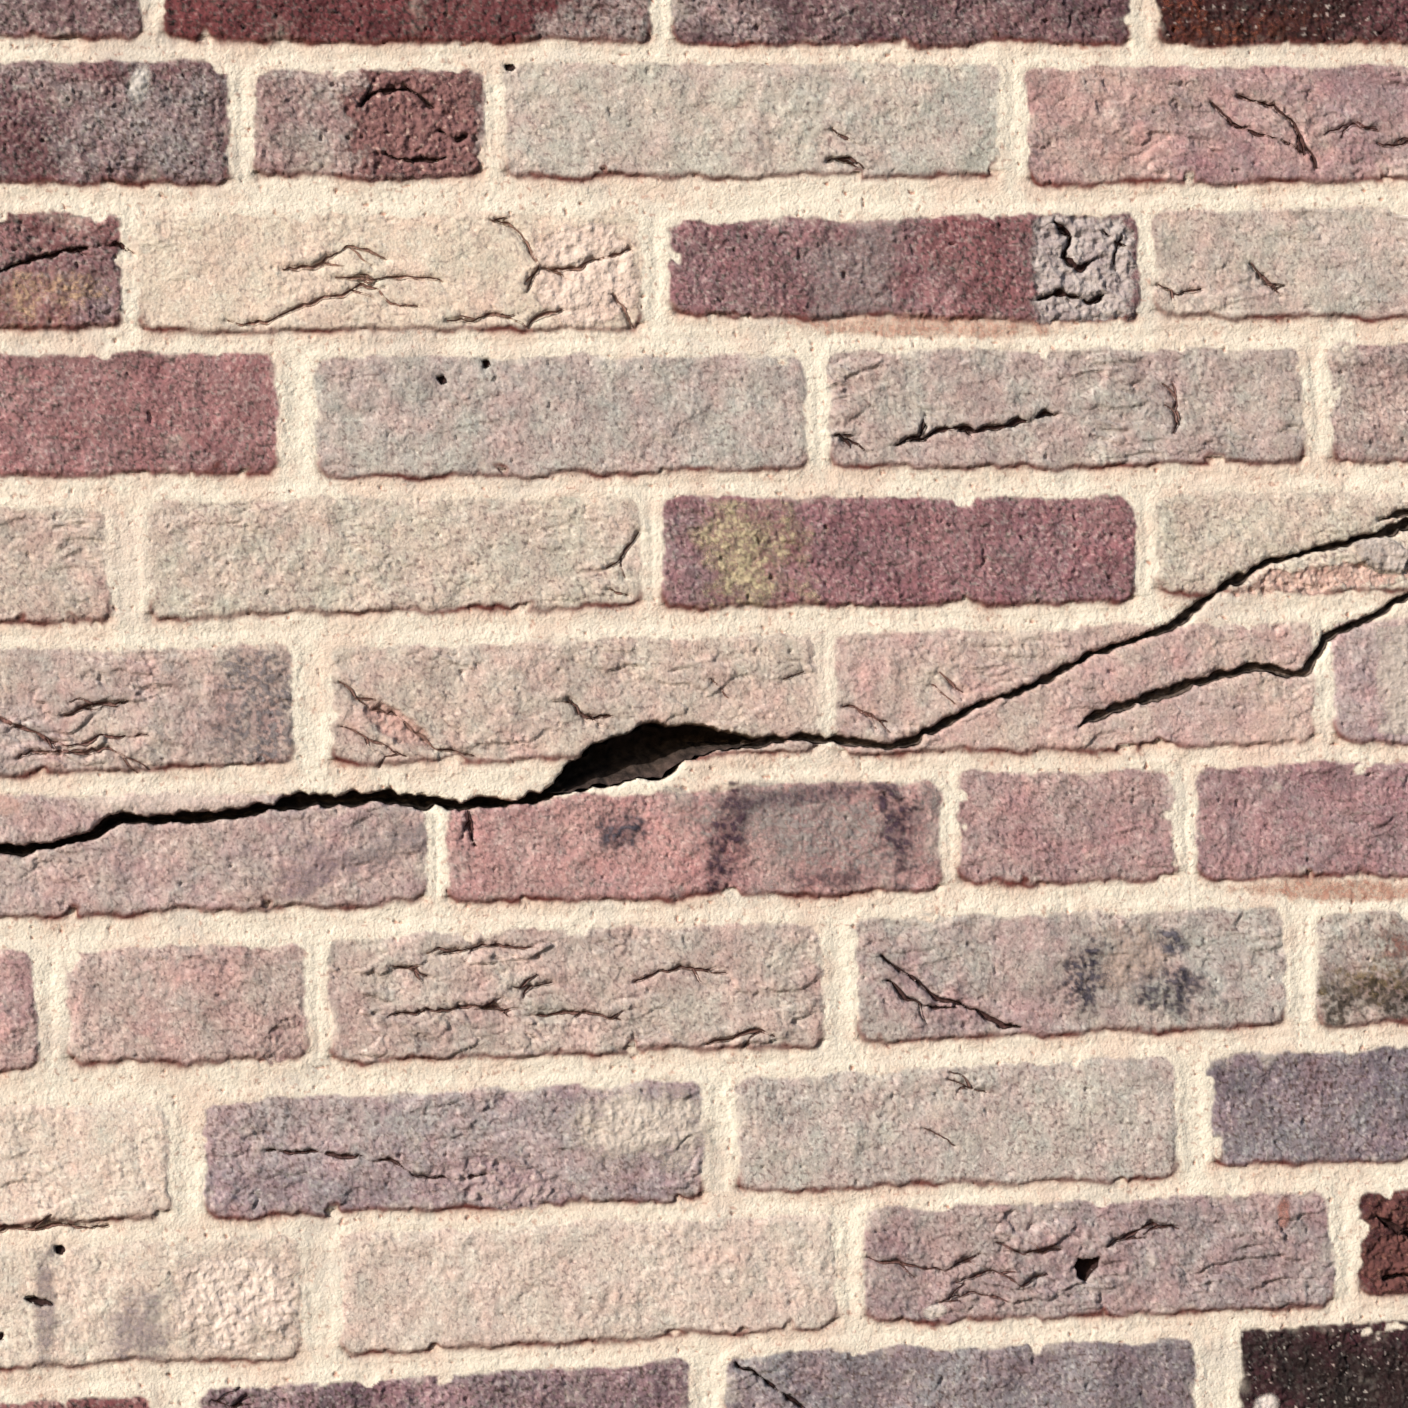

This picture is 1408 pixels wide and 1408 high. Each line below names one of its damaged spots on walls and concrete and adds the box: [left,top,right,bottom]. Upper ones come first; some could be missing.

crack [0,509,1408,855]